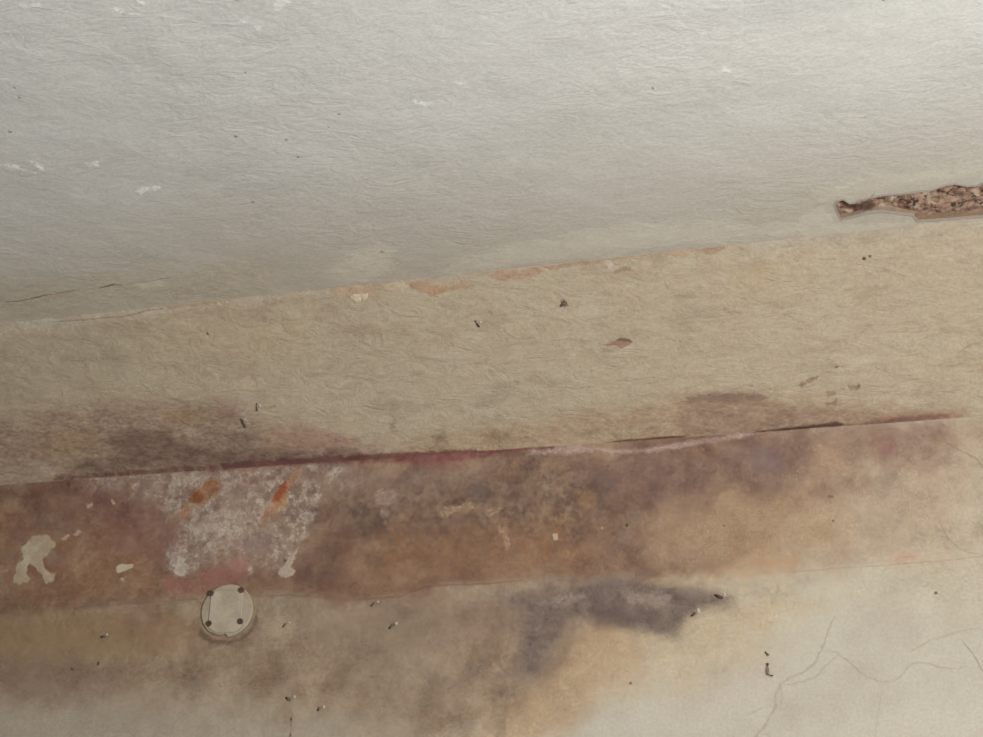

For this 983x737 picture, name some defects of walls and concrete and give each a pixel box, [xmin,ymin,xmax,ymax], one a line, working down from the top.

flaking render [833,182,983,223]
peeling [13,530,81,585]
leakage [0,402,983,737]